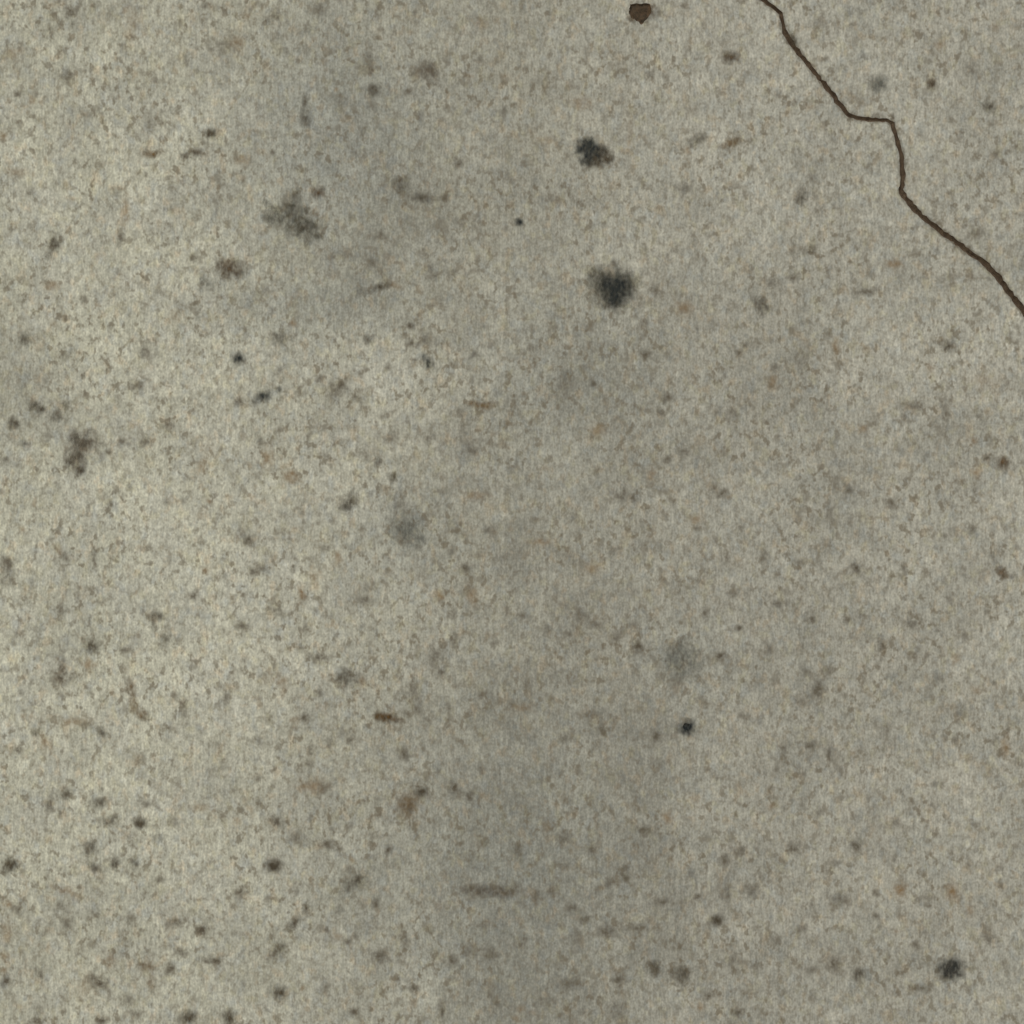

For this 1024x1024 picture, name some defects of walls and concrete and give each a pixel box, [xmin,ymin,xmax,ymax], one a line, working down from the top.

crack [761,0,1024,317]